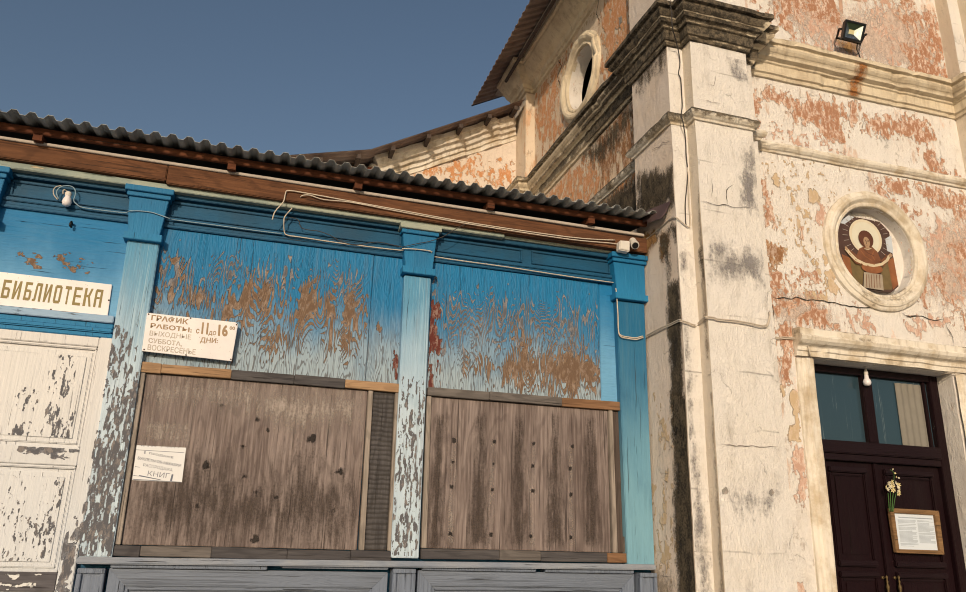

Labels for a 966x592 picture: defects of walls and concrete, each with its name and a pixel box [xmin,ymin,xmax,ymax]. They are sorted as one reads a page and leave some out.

peeling [546,102,635,205]
damp [583,109,633,162]
damp [602,162,675,211]
peeling [753,84,961,177]
peeling [152,239,382,366]
peeling [761,151,876,508]
crack [771,297,870,321]
peeling [0,325,139,592]
peeling [390,276,600,556]
damp [586,421,600,544]
damp [643,224,707,592]
damp [713,422,724,592]